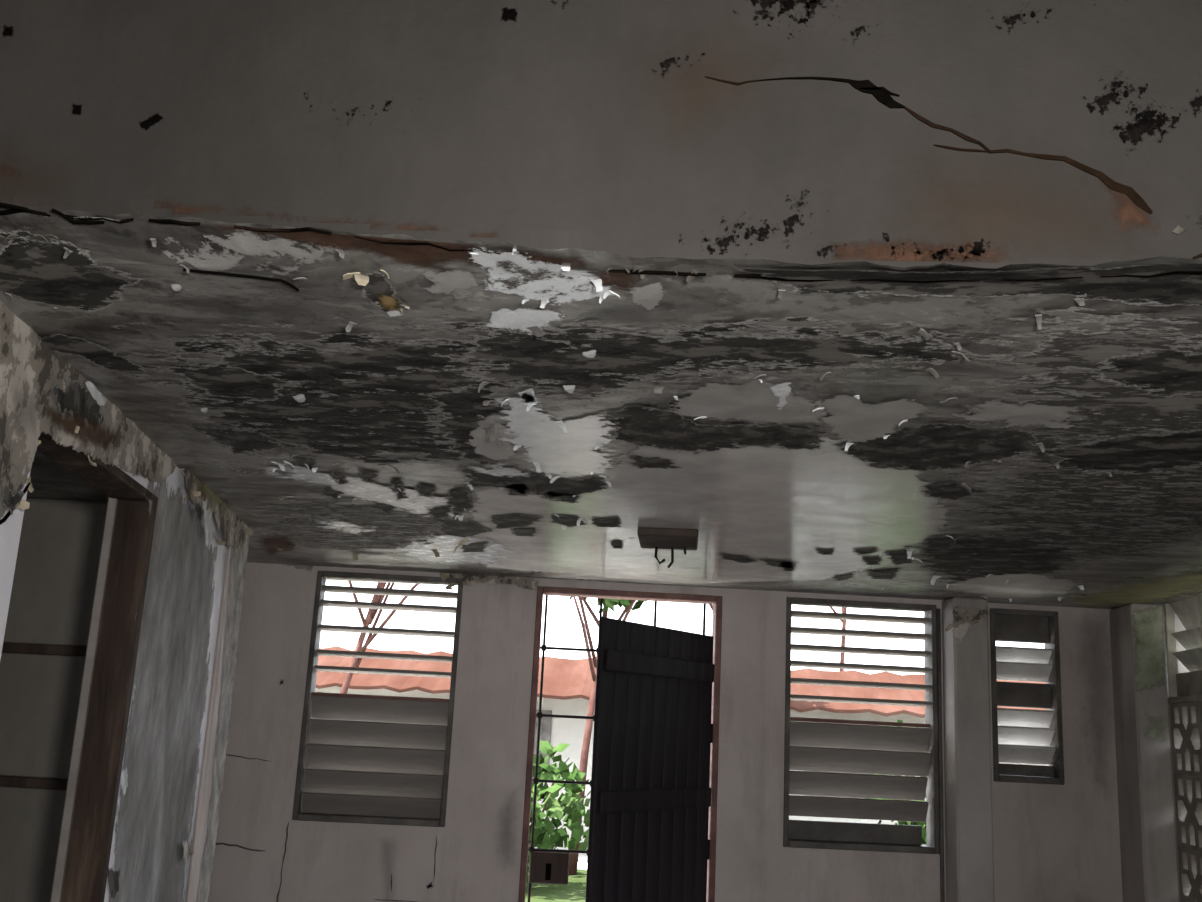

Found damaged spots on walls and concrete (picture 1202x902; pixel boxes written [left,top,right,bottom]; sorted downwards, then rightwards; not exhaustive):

damp [750,0,840,38]
damp [988,3,1052,35]
damp [654,53,705,78]
crack [705,76,1153,215]
damp [1083,74,1202,151]
peeling [0,209,1202,902]
crack [215,822,289,902]